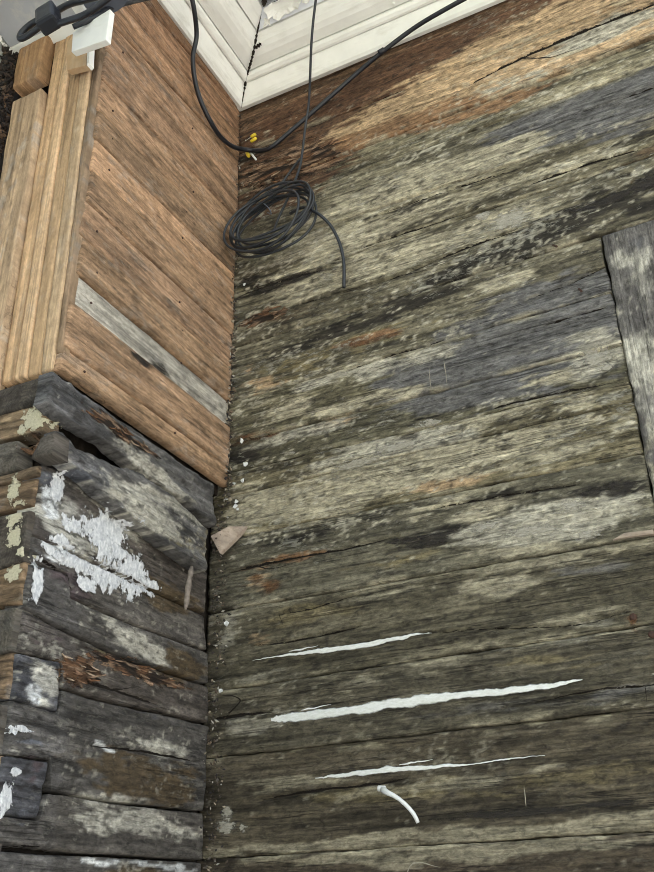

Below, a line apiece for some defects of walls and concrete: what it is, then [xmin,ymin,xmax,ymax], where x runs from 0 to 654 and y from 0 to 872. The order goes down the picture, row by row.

peeling [263,0,309,28]
crack [469,4,654,86]
peeling [17,406,62,439]
peeling [4,470,162,605]